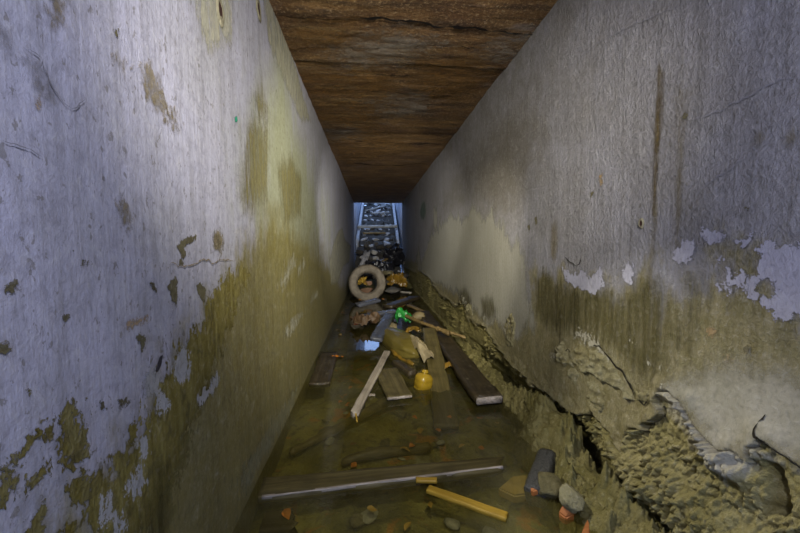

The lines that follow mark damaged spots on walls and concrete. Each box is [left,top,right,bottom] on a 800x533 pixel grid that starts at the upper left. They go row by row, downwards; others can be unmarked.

damp [143,62,176,130]
damp [244,126,268,210]
rust [653,66,663,215]
crack [168,258,233,268]
damp [213,230,224,255]
peeling [621,260,634,285]
peeling [672,226,800,323]
damp [416,203,800,455]
peeling [0,257,251,533]
flaking render [404,266,800,533]
crack [593,345,648,406]
crack [752,415,800,468]